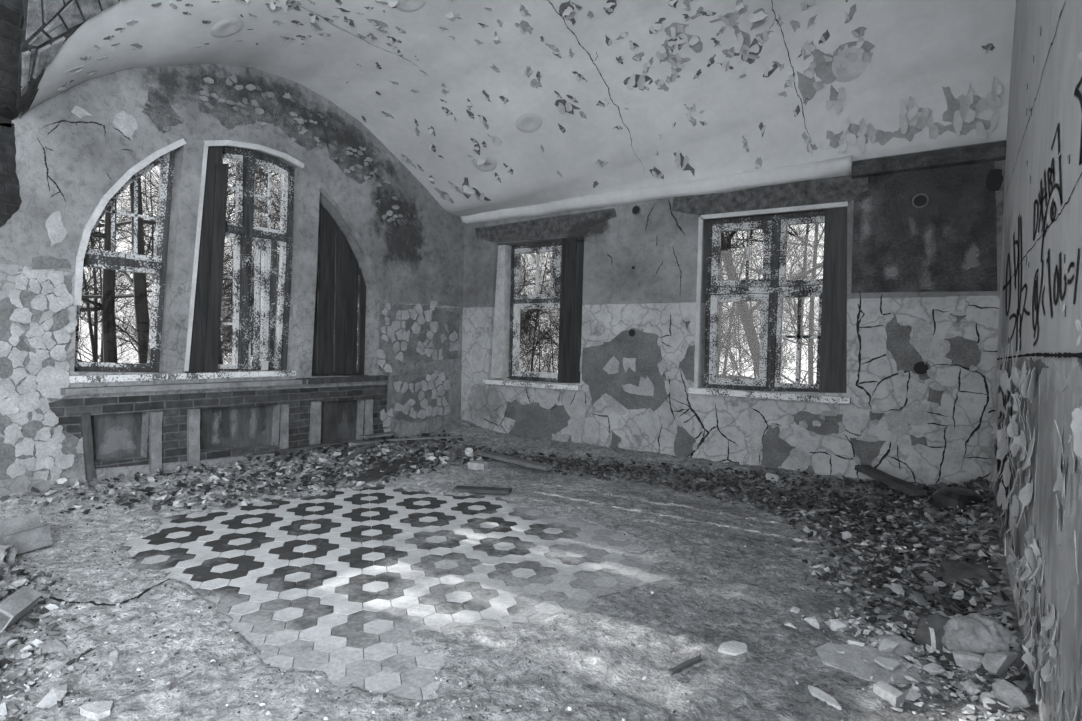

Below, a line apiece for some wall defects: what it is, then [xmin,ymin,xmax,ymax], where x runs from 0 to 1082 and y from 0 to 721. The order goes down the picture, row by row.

flaking render [0,0,125,227]
crack [37,120,133,202]
water stain [158,67,395,175]
peeling [198,74,416,228]
peeling [265,0,427,76]
water stain [374,191,423,261]
crack [549,1,645,173]
spalling [605,0,1003,155]
flaking render [0,256,460,485]
crack [483,390,610,433]
crack [645,200,782,464]
peeling [989,338,1082,721]